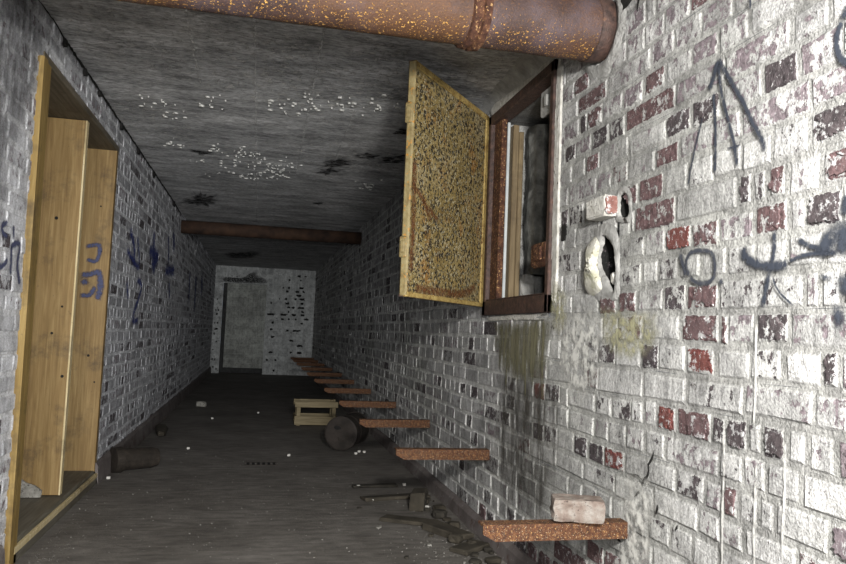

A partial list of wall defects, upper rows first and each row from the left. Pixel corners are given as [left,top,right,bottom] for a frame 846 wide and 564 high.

corrosion [409,162,438,269]
corrosion [417,285,475,297]
spalling [595,186,635,312]